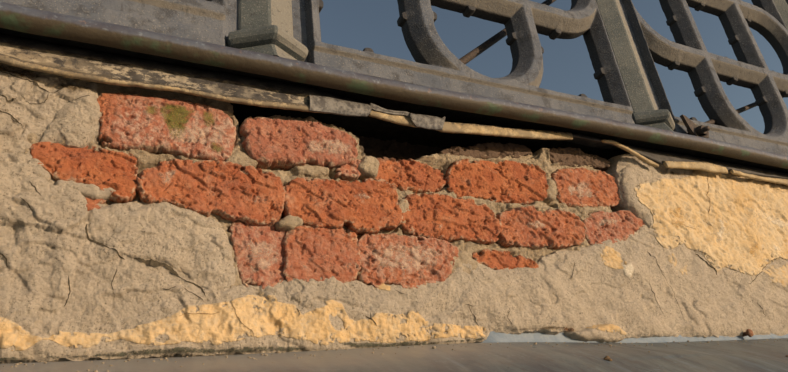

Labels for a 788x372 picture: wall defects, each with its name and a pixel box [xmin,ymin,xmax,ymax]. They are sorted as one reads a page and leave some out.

crack [0,72,94,128]
spalling [0,79,788,351]
crack [85,224,253,332]